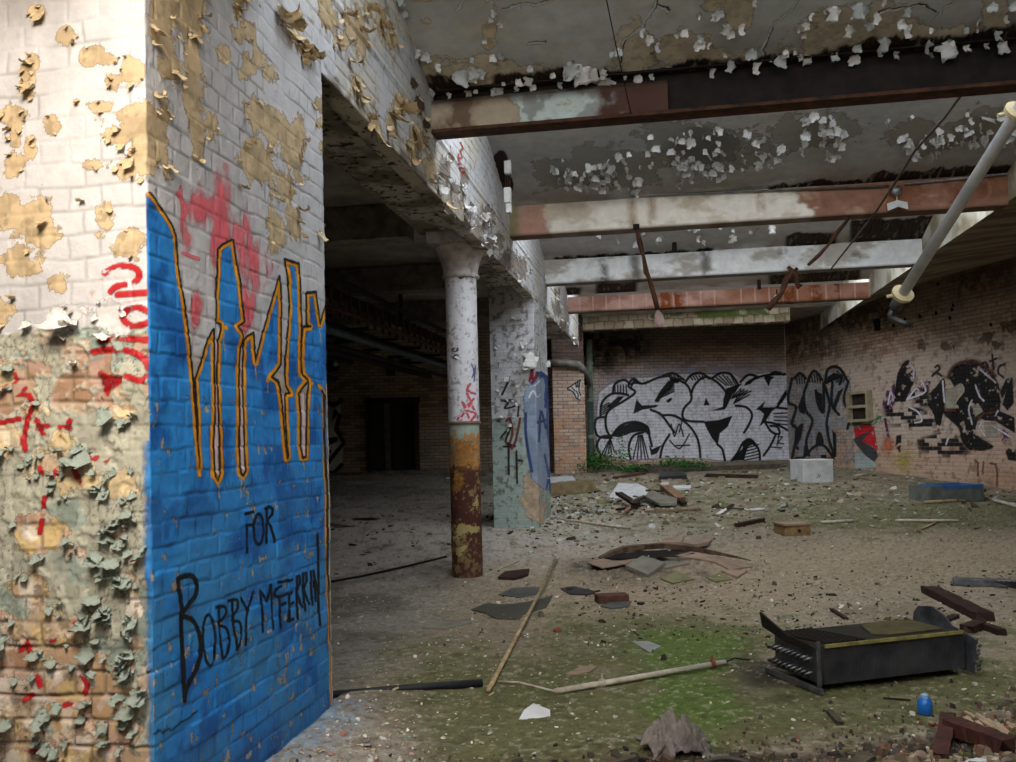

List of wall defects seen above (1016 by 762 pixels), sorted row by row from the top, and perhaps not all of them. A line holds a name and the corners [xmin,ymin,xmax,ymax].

peeling [0,51,62,179]
peeling [0,192,131,341]
peeling [94,201,147,262]
peeling [55,0,222,183]
peeling [234,93,329,255]
crack [618,0,670,65]
peeling [277,0,1016,283]
corrosion [660,292,683,310]
corrosion [890,184,923,202]
crack [878,0,957,22]
peeling [0,423,147,762]
corrosion [451,523,480,557]